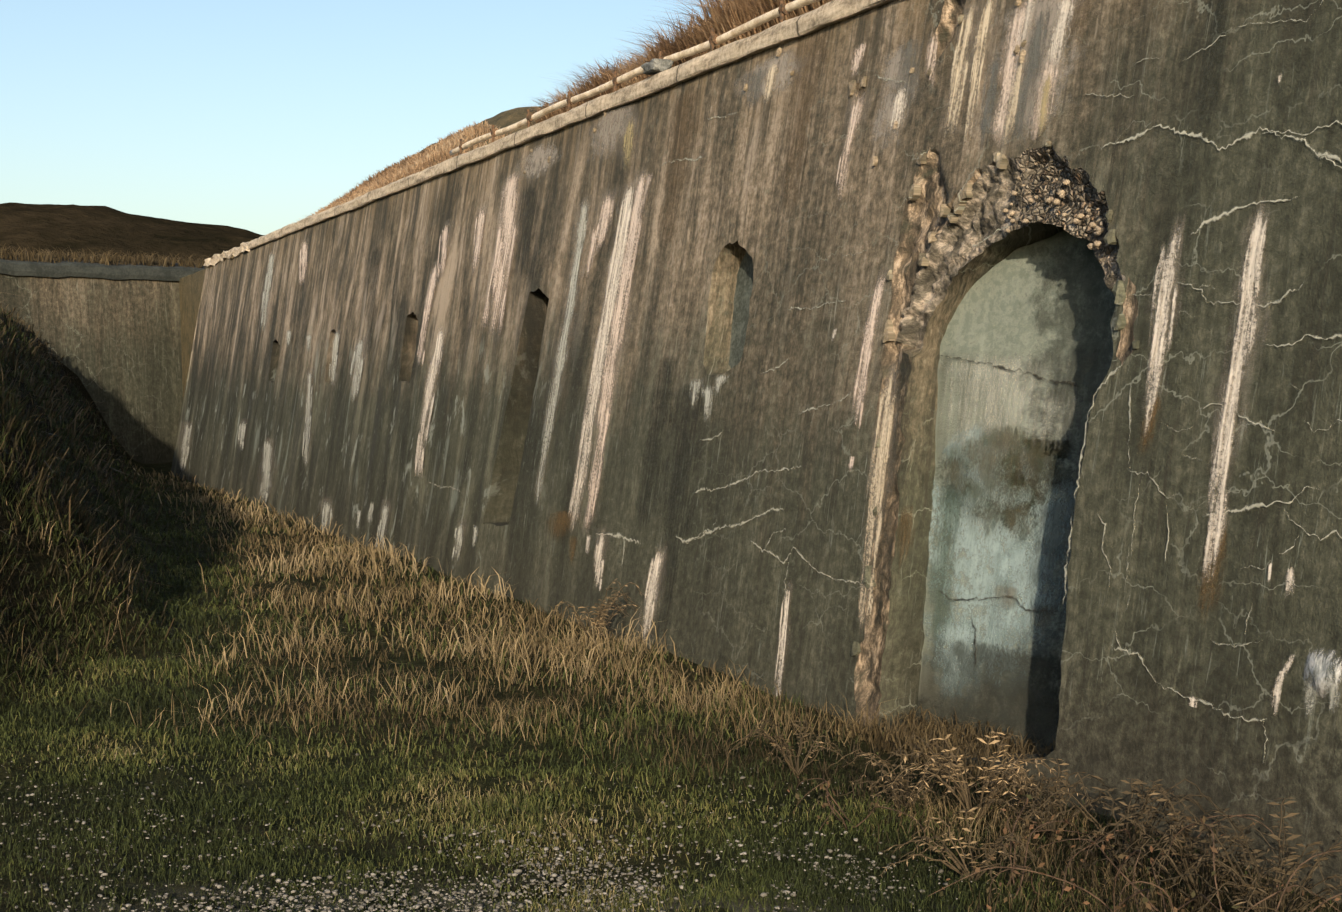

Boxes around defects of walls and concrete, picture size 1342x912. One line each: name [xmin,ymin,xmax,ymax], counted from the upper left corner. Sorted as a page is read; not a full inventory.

damp [415,226,448,473]
damp [472,175,518,333]
damp [536,174,651,591]
damp [947,0,994,140]
spalling [851,0,1140,728]
damp [1145,234,1181,432]
crack [1100,120,1342,168]
damp [1203,215,1266,575]
crack [1193,197,1296,233]
crack [676,466,861,588]
crack [940,355,1171,665]
crack [1207,486,1342,569]